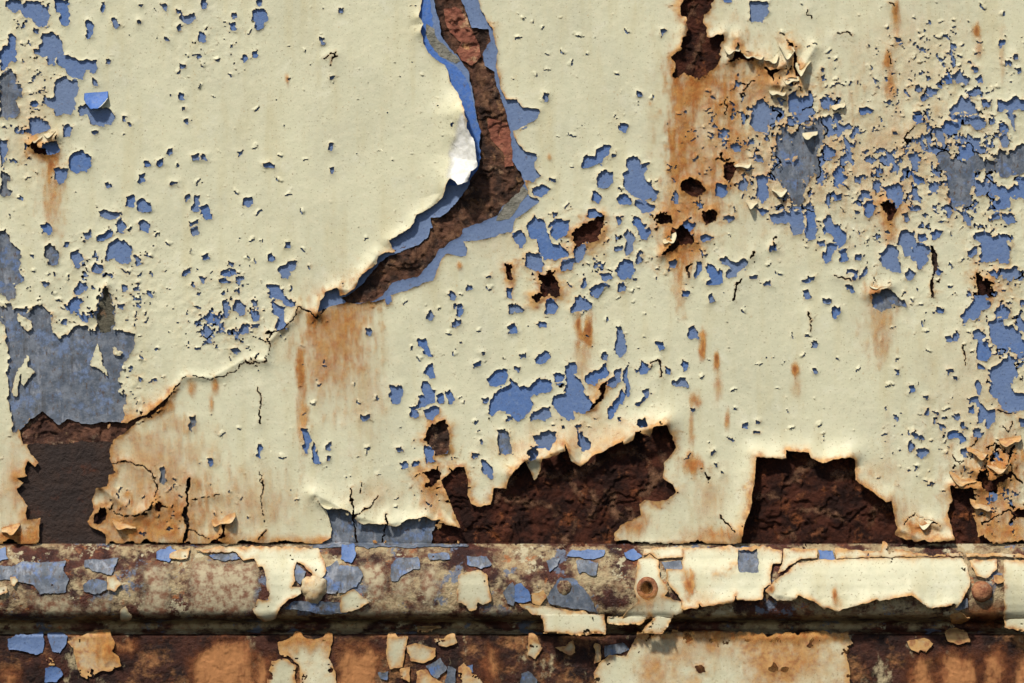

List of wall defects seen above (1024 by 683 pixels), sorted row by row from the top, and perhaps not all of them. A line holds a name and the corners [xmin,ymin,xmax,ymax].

peeling [0,158,164,433]
peeling [318,0,714,334]
corrosion [532,270,560,303]
corrosion [571,215,608,249]
corrosion [653,0,754,284]
peeling [715,43,944,312]
peeling [912,66,1024,281]
crack [181,477,220,544]
crack [349,482,388,543]
corrosion [416,419,703,550]
corrosion [700,444,1024,549]
peeling [519,541,1024,683]